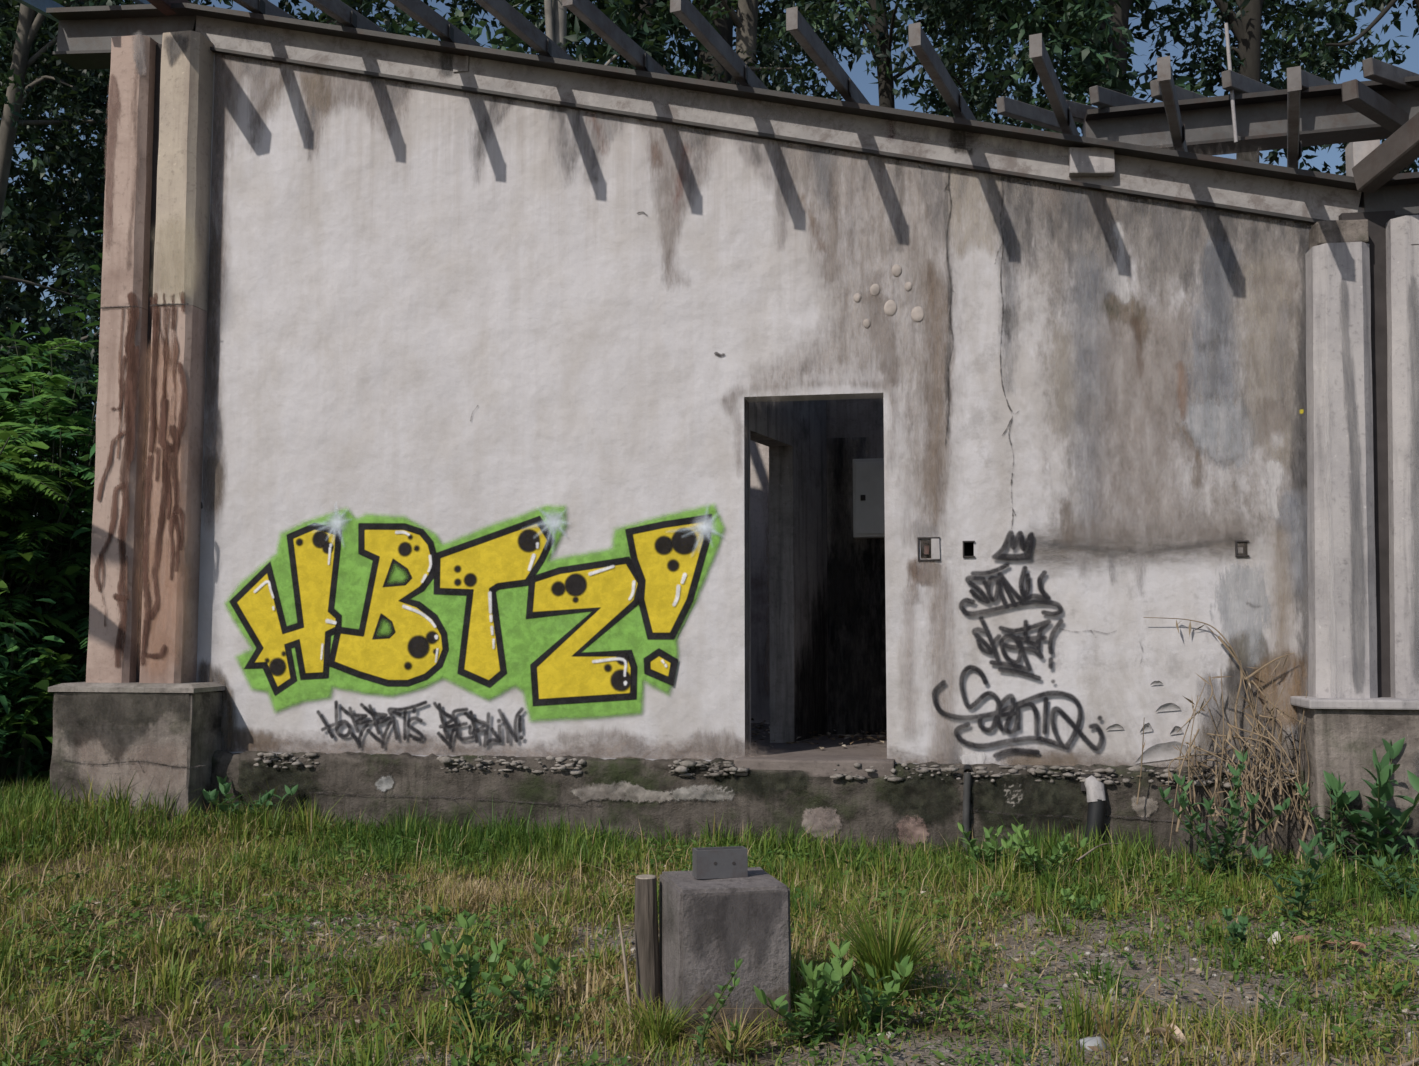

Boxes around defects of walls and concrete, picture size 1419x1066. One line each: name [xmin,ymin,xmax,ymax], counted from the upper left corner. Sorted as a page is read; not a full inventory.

leakage [622,84,819,125]
leakage [895,121,1068,158]
rust [148,307,179,531]
crack [995,182,1019,524]
leakage [745,140,1311,696]
leakage [1329,281,1364,694]
leakage [795,437,887,742]
spalling [254,752,320,769]
spalling [376,776,394,791]
spalling [437,755,750,803]
spalling [830,703,1299,818]
leakage [1008,633,1299,770]